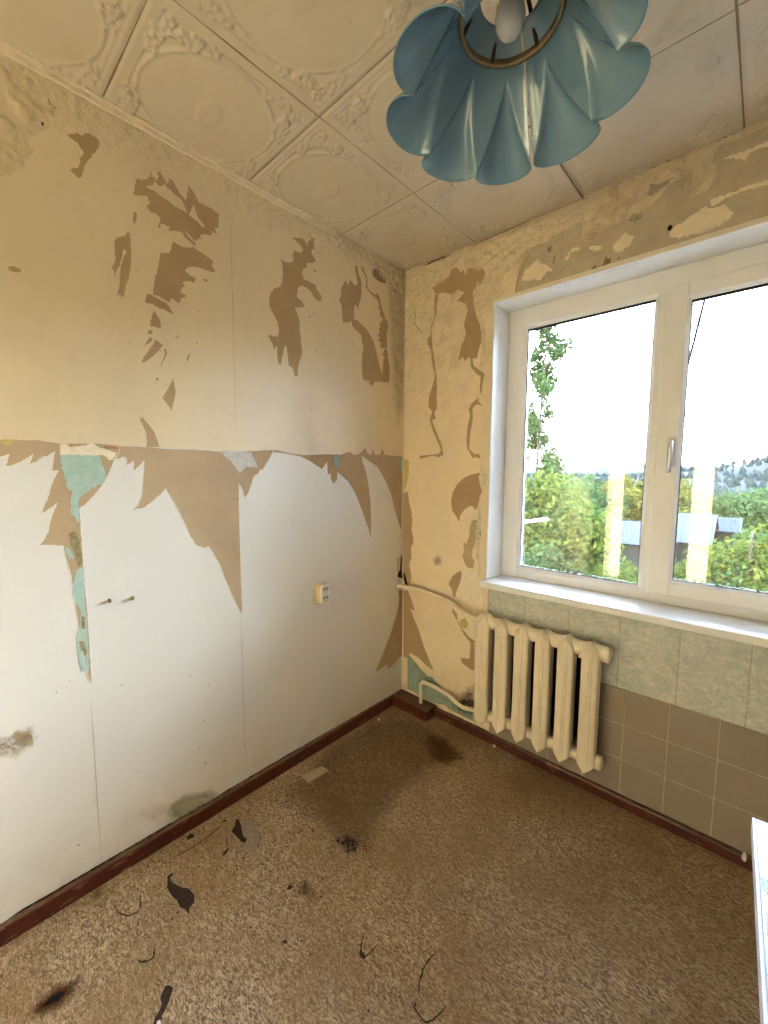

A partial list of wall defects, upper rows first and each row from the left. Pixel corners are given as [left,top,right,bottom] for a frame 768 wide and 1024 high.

flaking render [0,125,768,683]
damp [174,795,206,817]